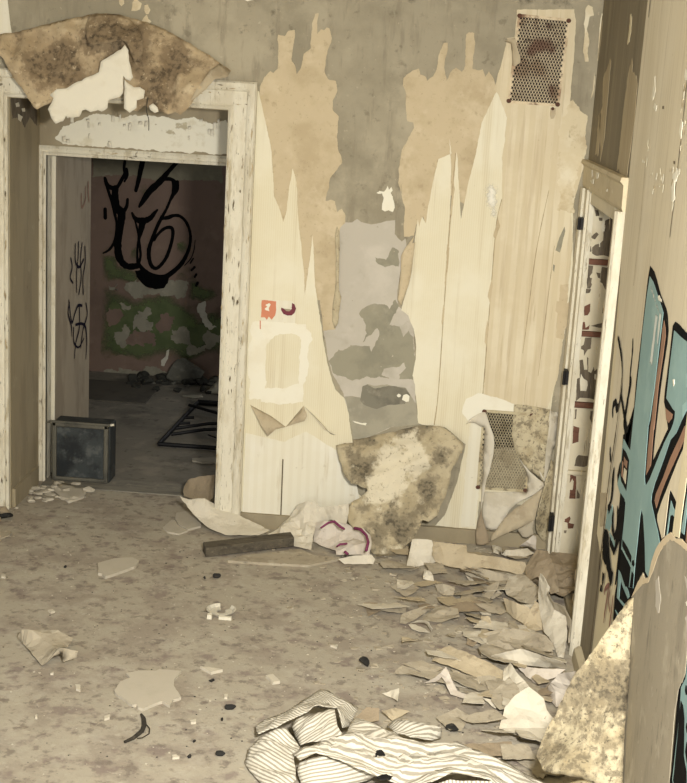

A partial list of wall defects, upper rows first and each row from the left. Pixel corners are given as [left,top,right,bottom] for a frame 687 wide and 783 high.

peeling [119,0,151,23]
corrosion [528,40,554,55]
peeling [583,5,603,62]
peeling [11,98,38,128]
peeling [55,113,228,170]
flaking render [557,100,588,213]
peeling [650,168,680,211]
peeling [106,280,228,356]
flaking render [324,186,416,405]
peeling [104,366,169,376]
peeling [569,210,613,499]
peeling [467,404,550,545]